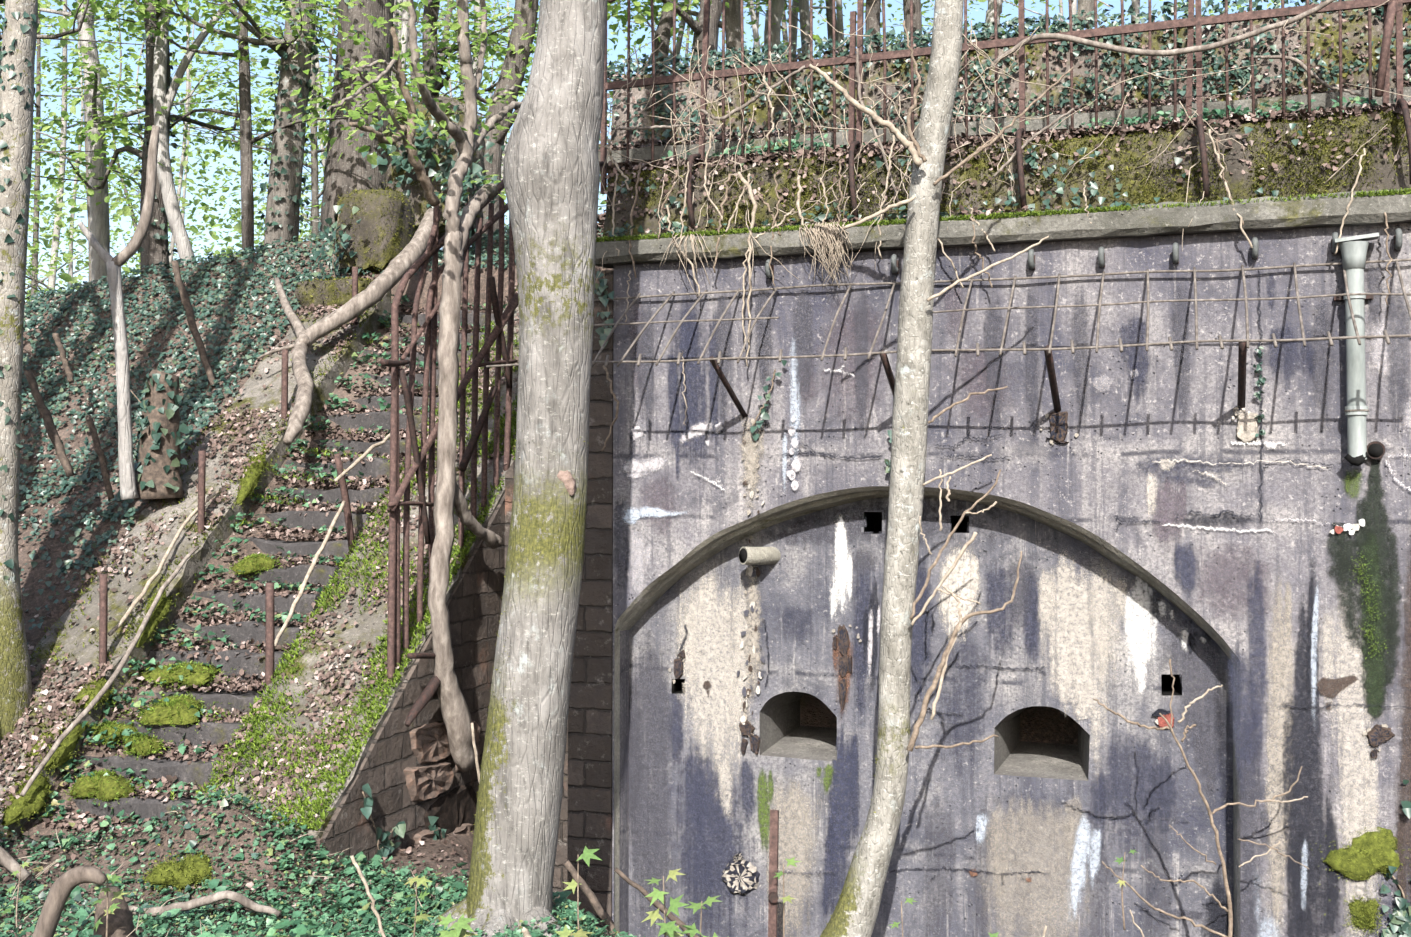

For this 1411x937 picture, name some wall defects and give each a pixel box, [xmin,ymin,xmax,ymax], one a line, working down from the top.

damp [614,296,730,587]
damp [755,287,771,386]
damp [782,288,879,490]
damp [629,577,860,936]
damp [768,501,889,710]
damp [911,455,1378,937]